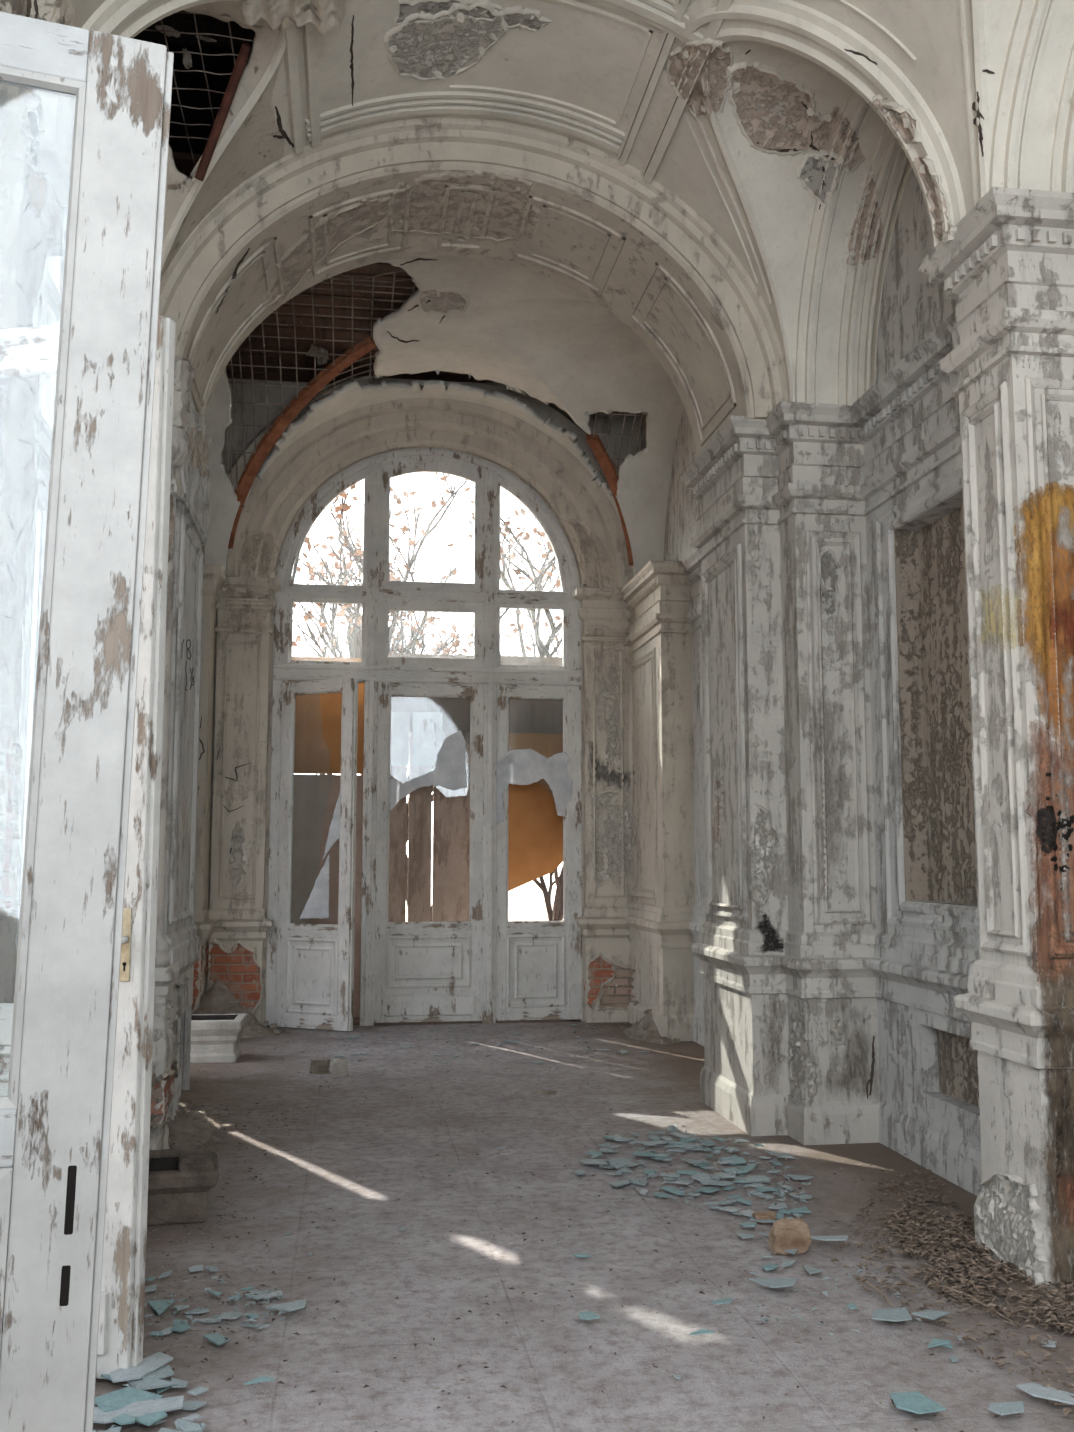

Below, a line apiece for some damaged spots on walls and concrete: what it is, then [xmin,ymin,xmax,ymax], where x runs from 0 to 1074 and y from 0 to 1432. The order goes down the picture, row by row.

spalling [132,11,253,181]
spalling [383,0,553,81]
spalling [666,38,883,269]
spalling [869,94,957,244]
flaking render [0,725,23,921]
flaking render [150,937,265,1129]
flaking render [584,952,639,1012]
damp [1033,908,1074,1286]